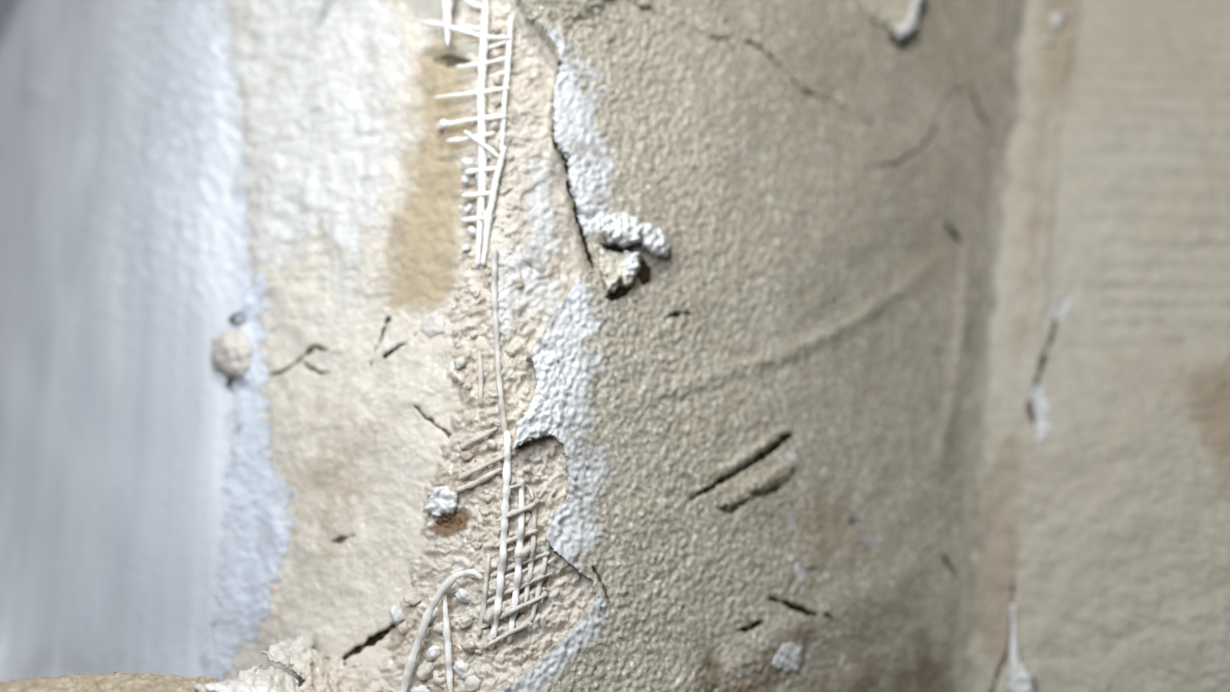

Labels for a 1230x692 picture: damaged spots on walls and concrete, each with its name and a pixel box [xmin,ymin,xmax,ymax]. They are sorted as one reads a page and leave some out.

crack [628,0,654,12]
crack [692,27,849,109]
spalling [377,0,672,692]
crack [1027,299,1063,429]
peeling [200,271,294,682]
crack [716,482,785,515]
crack [738,597,835,632]
crack [990,576,1015,692]